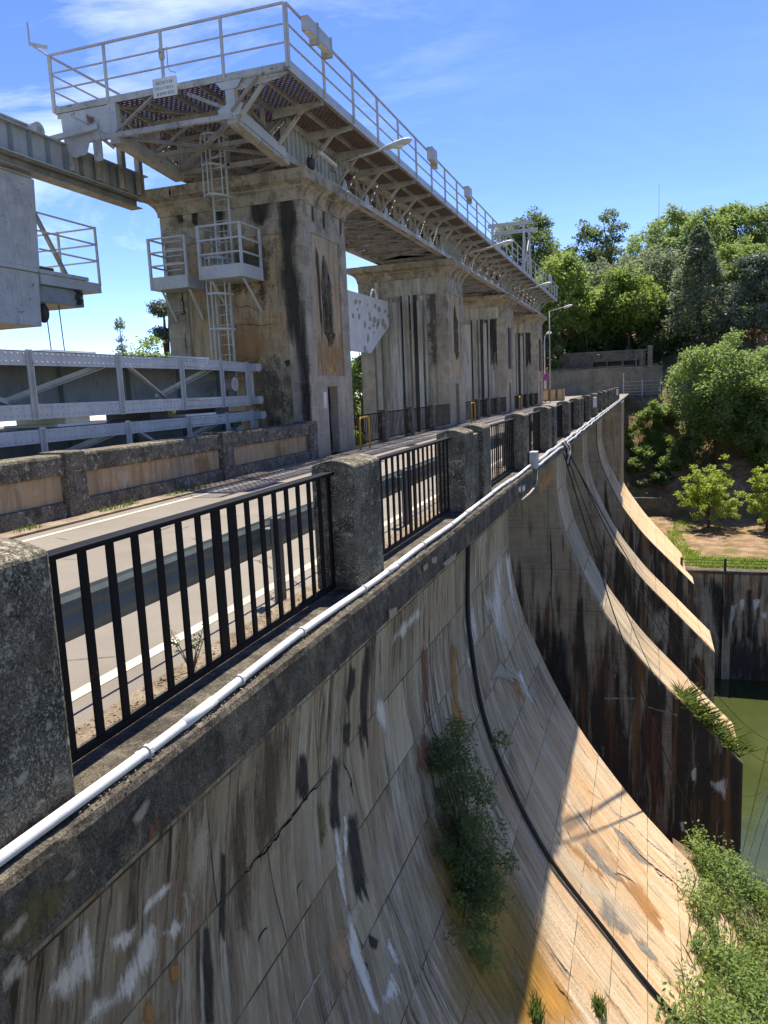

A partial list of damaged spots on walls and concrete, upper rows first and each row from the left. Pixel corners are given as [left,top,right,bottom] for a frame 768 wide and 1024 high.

leakage [232,200,311,426]
leakage [398,294,437,399]
leakage [547,631,574,715]
crack [227,760,356,898]
leakage [297,756,309,801]
leakage [711,779,727,799]
leakage [321,759,400,1013]
leakage [49,925,94,999]
leakage [86,885,181,1024]